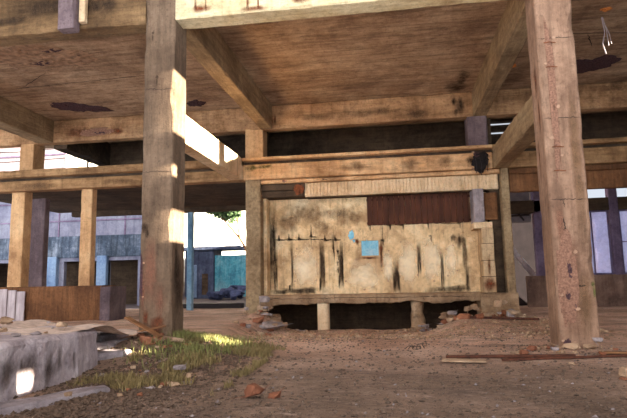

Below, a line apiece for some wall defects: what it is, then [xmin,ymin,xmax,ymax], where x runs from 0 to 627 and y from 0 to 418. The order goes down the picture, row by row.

spalling [576,55,622,74]
spalling [49,102,114,113]
leakage [270,208,344,289]